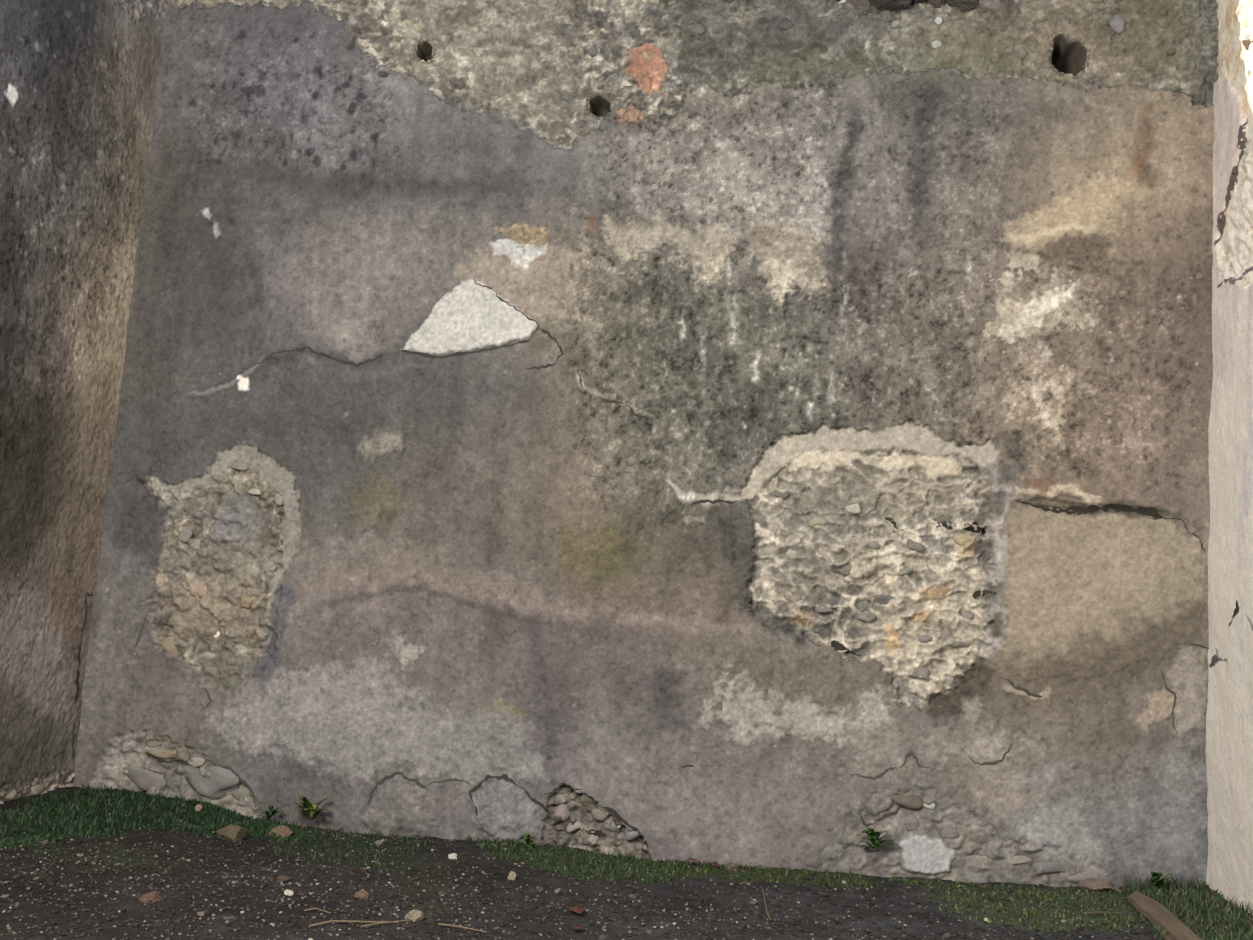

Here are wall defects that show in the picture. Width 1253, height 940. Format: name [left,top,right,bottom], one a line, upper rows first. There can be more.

flaking render [112,0,1219,150]
crack [190,340,405,399]
spalling [402,325,539,358]
crack [473,278,656,418]
crack [1006,470,1205,552]
flaking render [116,440,304,700]
flaking render [728,418,1110,887]
flaking render [0,728,262,819]
crack [425,778,472,786]
flaking render [539,783,652,860]